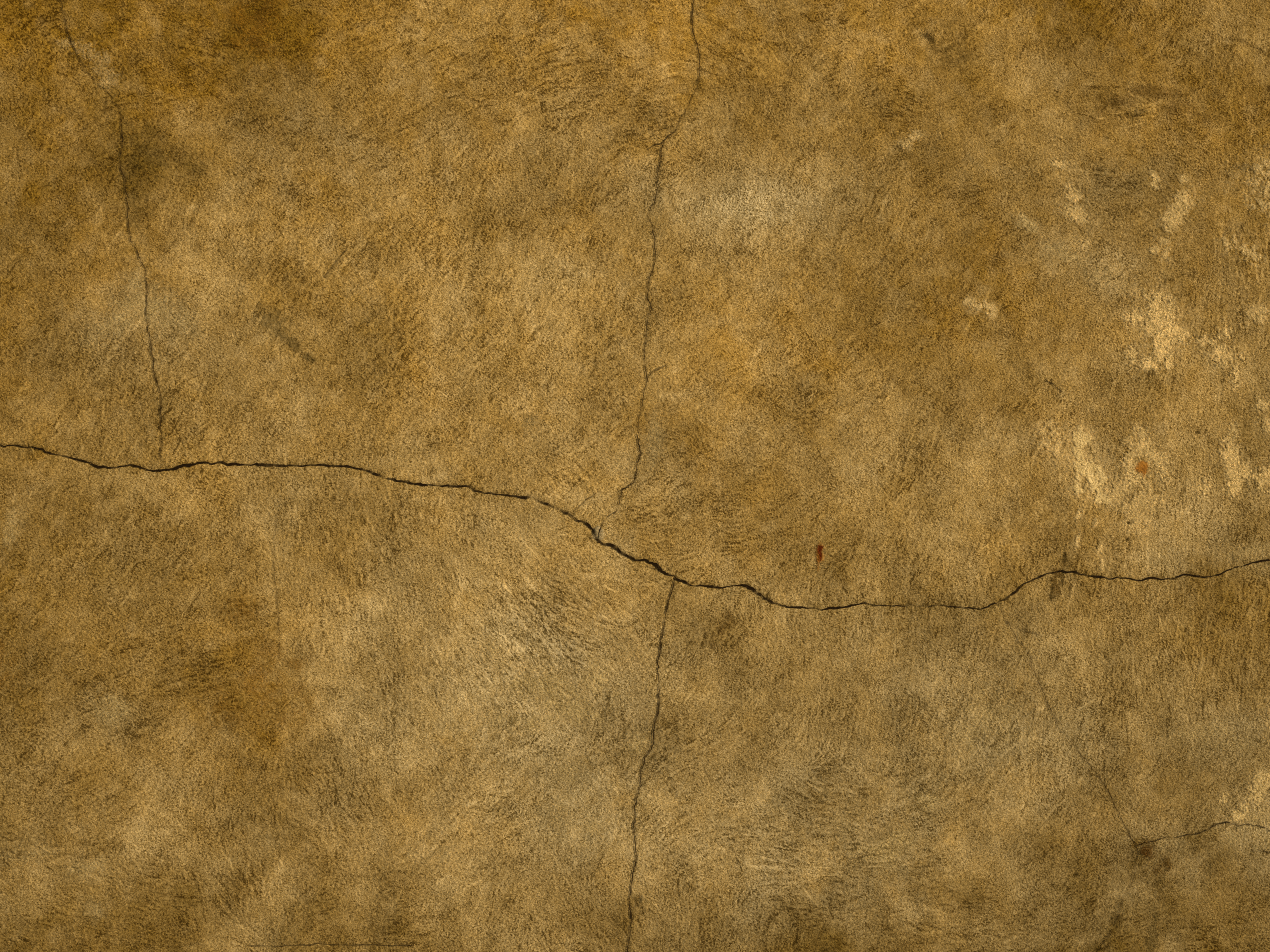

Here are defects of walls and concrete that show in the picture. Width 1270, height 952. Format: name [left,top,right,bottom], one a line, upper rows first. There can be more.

crack [59,0,79,60]
crack [691,0,700,80]
crack [0,112,905,952]
crack [943,559,1270,703]
crack [1087,762,1269,852]